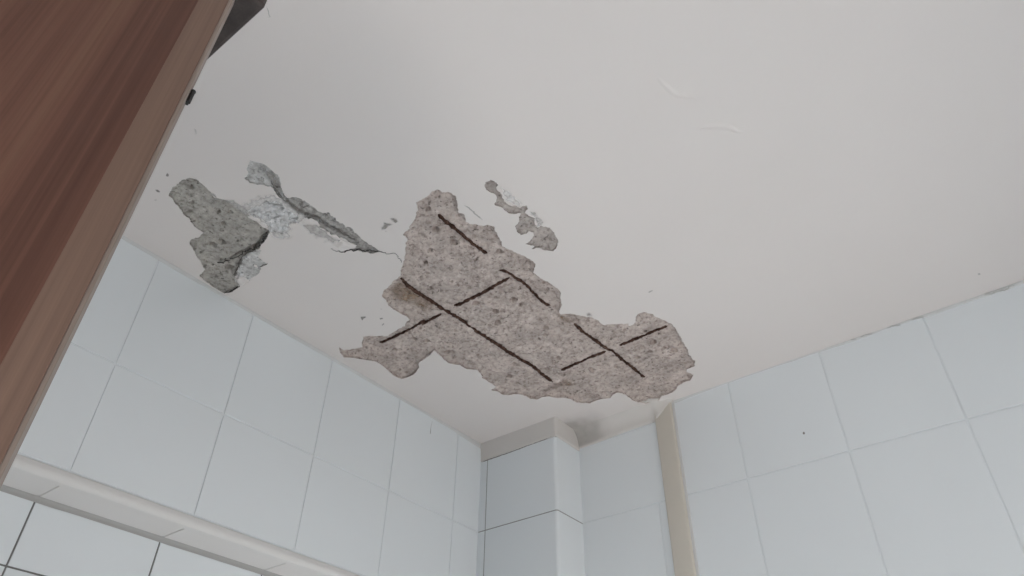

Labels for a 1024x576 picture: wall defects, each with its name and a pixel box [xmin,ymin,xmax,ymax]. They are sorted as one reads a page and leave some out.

spalling [157,174,303,293]
crack [244,161,402,262]
spalling [339,180,695,403]